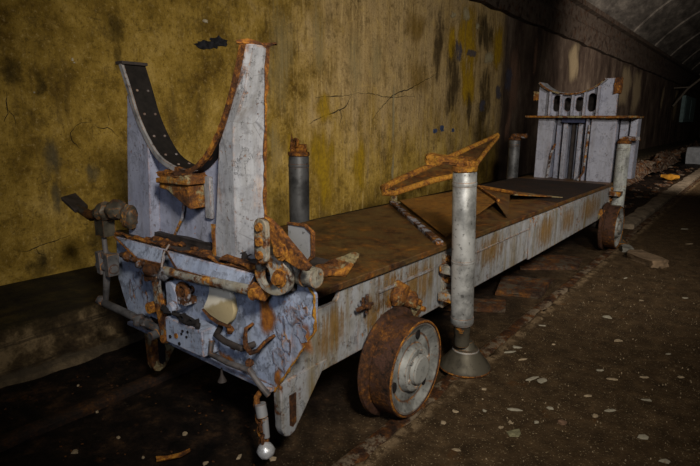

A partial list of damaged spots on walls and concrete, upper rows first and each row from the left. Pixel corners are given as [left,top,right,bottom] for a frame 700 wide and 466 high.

peeling [194,35,228,50]
water stain [433,21,443,78]
crack [309,76,433,124]
water stain [447,49,459,115]
water stain [467,73,490,124]